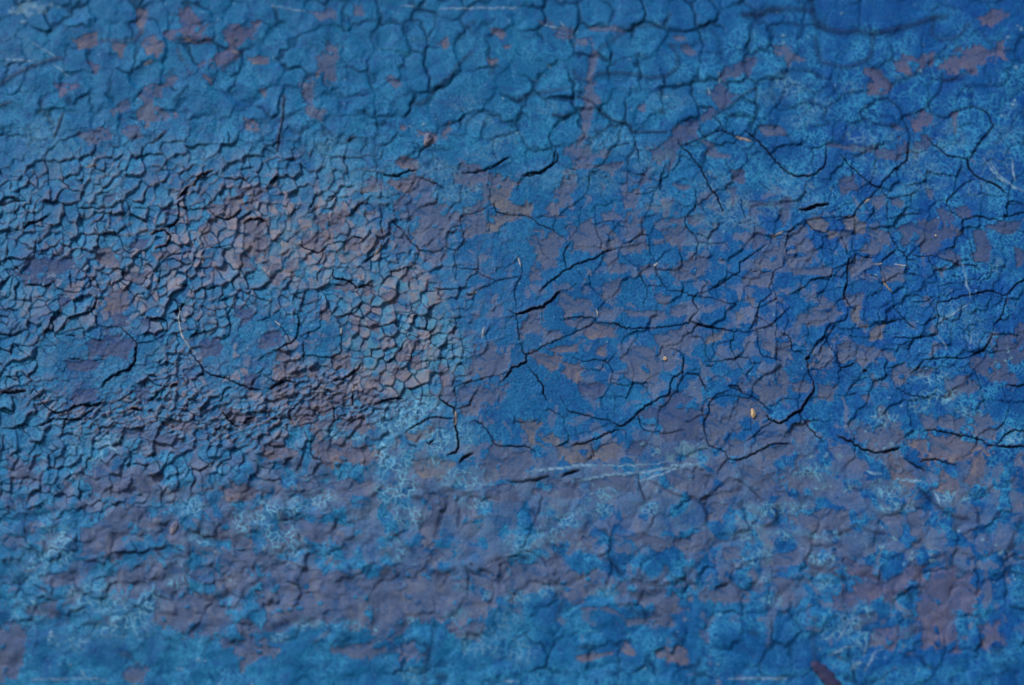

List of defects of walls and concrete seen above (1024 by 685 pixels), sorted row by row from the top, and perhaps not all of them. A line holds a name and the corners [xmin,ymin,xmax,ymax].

peeling [742,197,1021,305]
peeling [257,330,423,500]
crack [0,109,1024,560]
peeling [614,324,838,553]
peeling [797,293,995,497]
peeling [944,323,1024,400]
crack [16,522,71,617]
crack [69,577,184,646]
peeling [80,418,750,674]
crack [738,503,839,605]
crack [825,607,876,647]
peeling [759,508,1007,654]